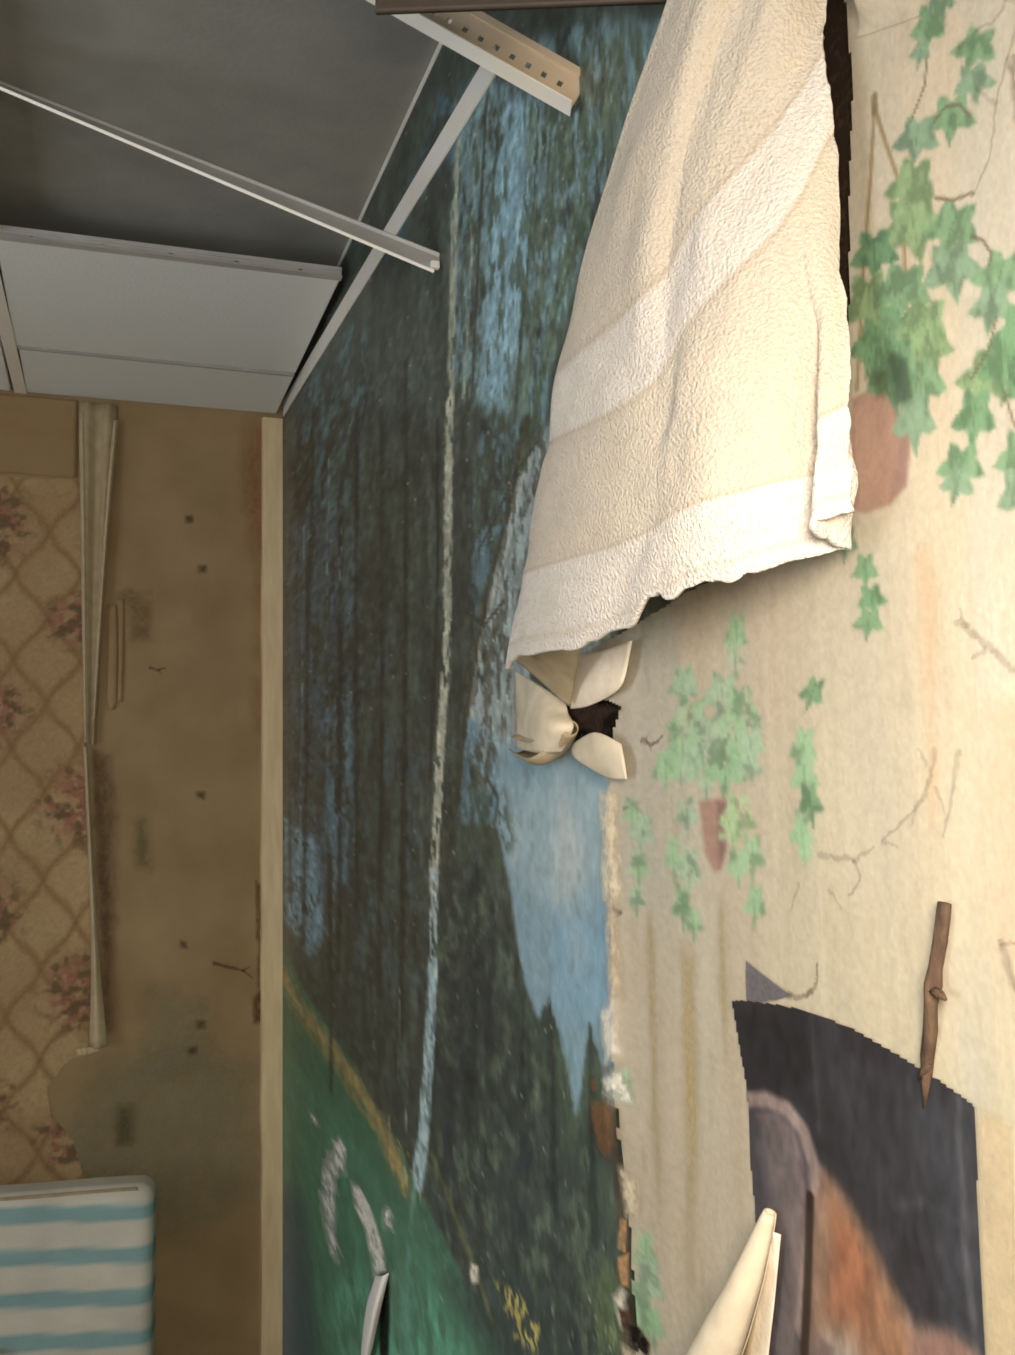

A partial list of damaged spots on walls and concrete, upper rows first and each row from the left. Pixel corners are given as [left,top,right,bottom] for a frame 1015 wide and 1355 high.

peeling [334,1140,346,1174]
peeling [620,1171,638,1217]
spalling [615,1294,649,1355]